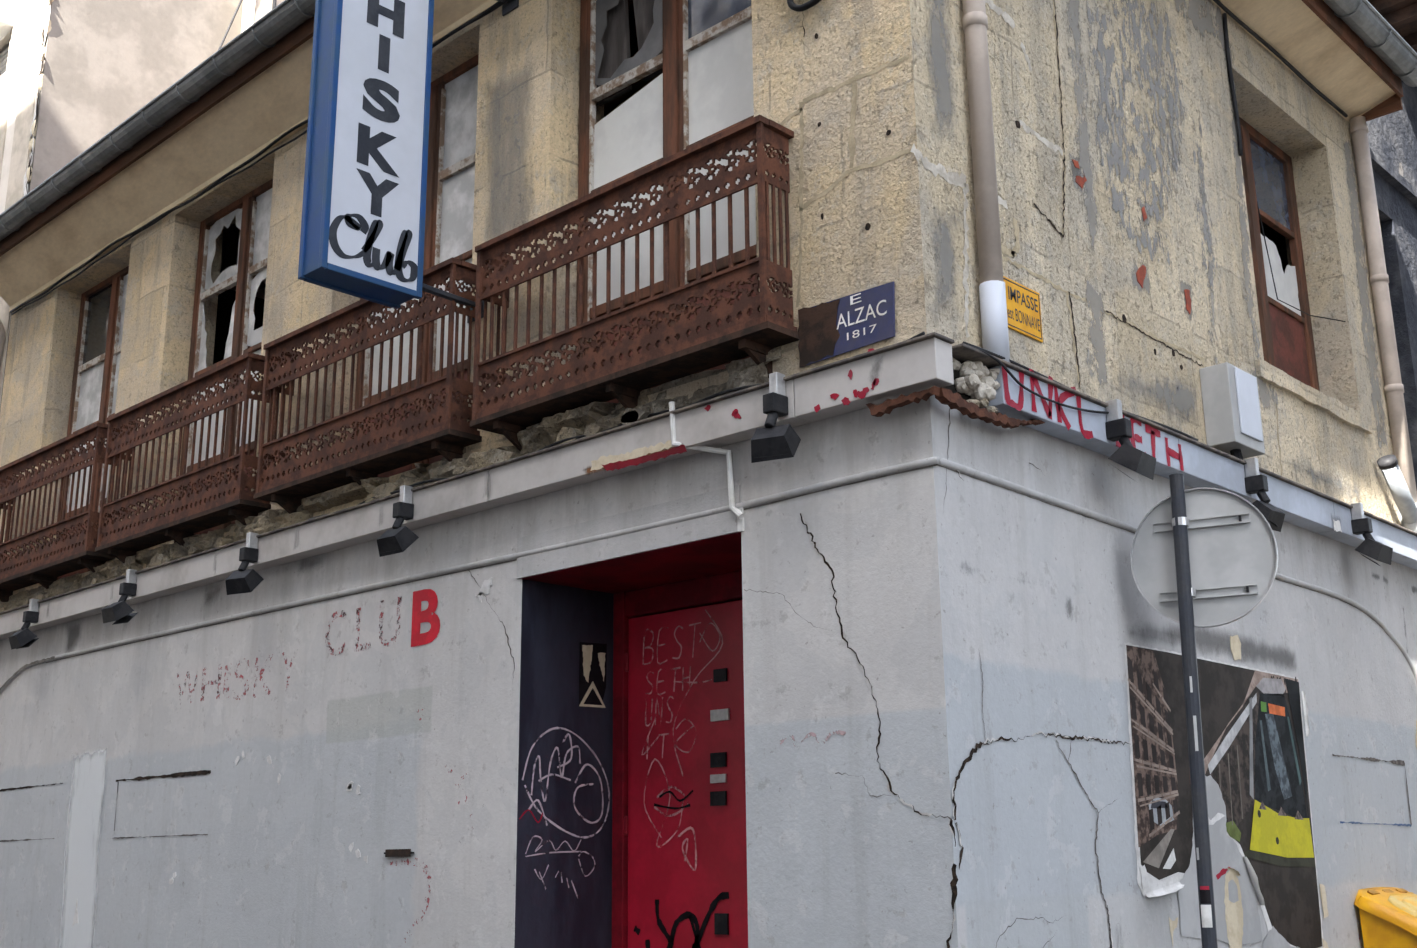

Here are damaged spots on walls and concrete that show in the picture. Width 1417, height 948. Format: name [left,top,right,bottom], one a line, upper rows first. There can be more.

spalling [1069,154,1087,192]
peeling [1087,0,1218,319]
spalling [0,346,782,612]
spalling [866,358,1045,429]
crack [744,513,1131,948]